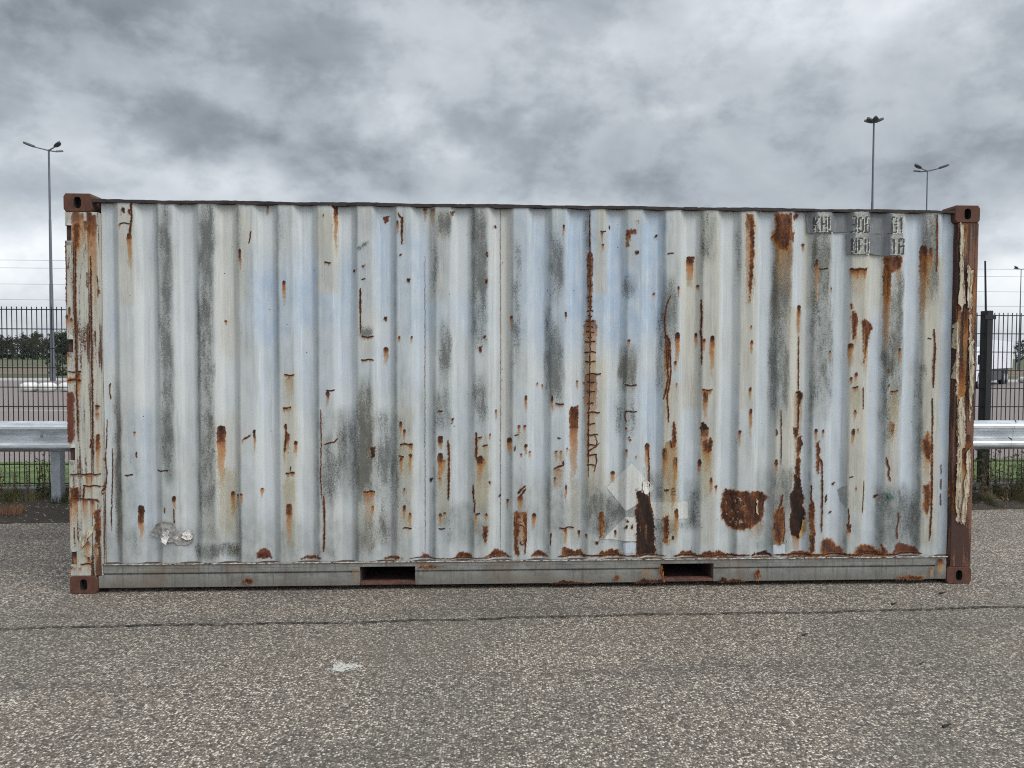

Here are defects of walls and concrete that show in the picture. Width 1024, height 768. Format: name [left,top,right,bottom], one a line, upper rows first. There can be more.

corrosion [64,211,97,326]
corrosion [745,214,756,303]
corrosion [770,213,805,259]
corrosion [882,255,903,311]
peeling [951,223,975,526]
corrosion [958,304,969,399]
corrosion [67,391,75,443]
corrosion [90,434,101,461]
corrosion [217,426,226,467]
corrosion [385,304,922,583]
corrosion [947,435,971,512]
corrosion [93,509,101,546]